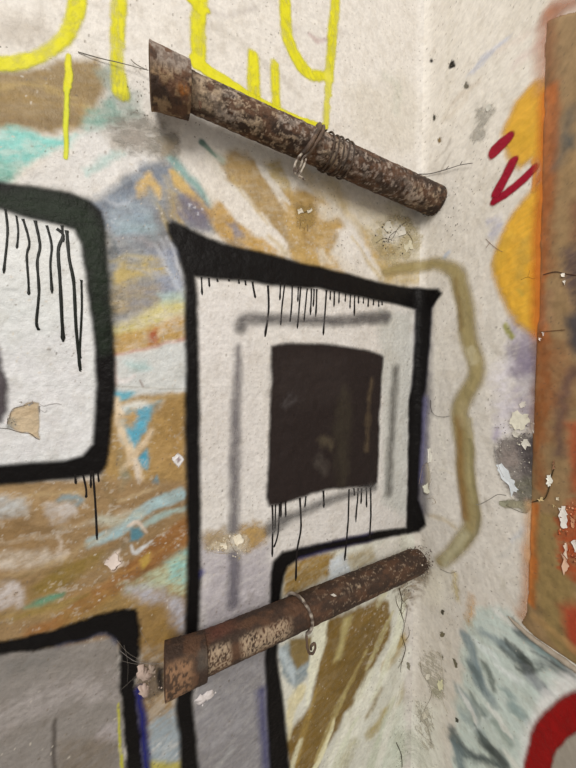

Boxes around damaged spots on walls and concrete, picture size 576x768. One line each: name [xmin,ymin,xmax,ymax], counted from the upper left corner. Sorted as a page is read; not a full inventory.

peeling [2,402,57,440]
peeling [475,401,576,575]
flaking render [122,652,164,699]